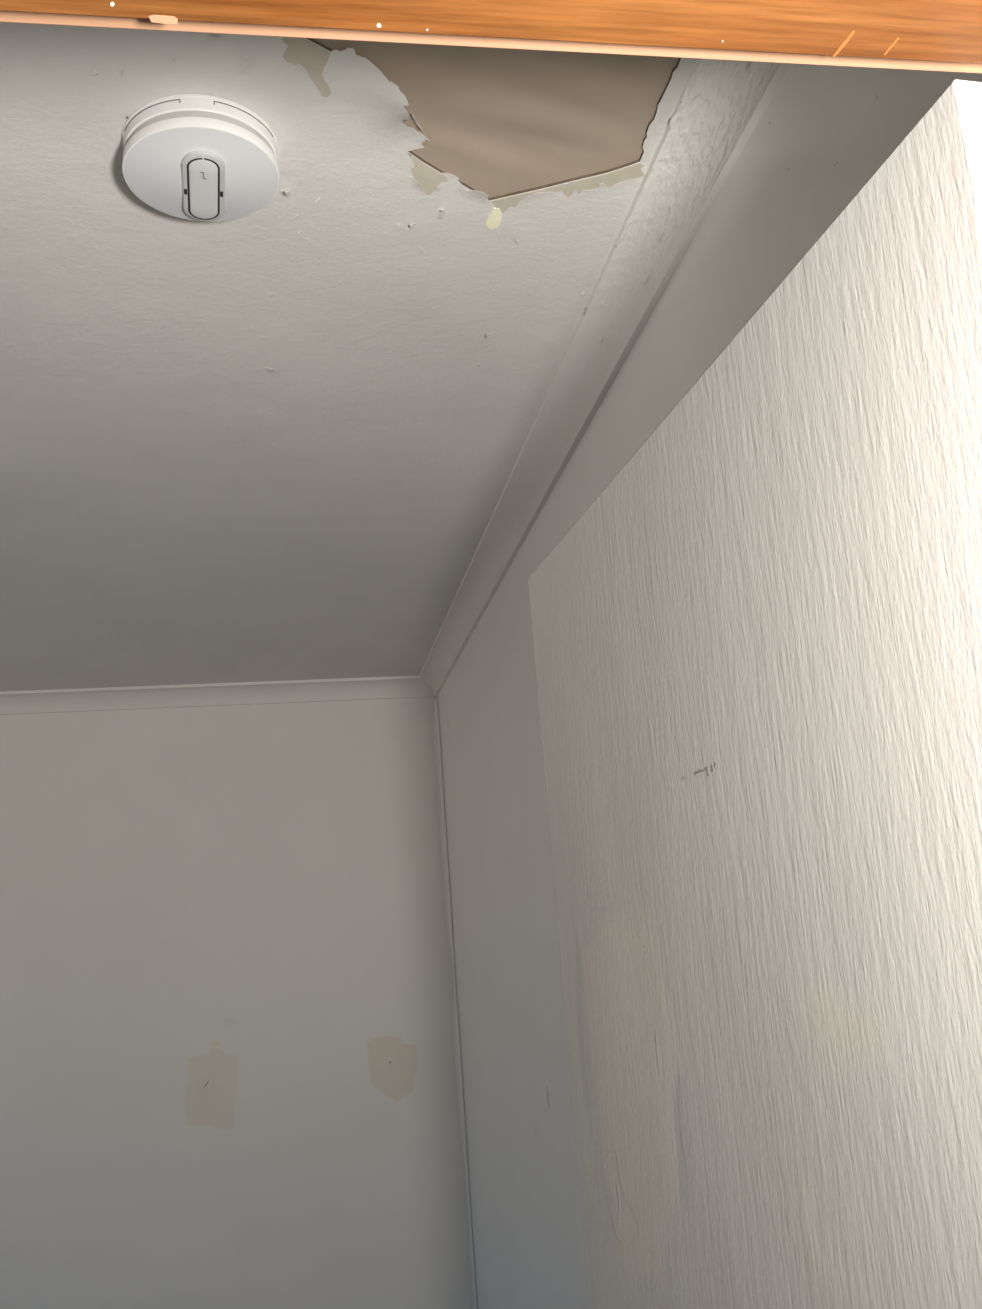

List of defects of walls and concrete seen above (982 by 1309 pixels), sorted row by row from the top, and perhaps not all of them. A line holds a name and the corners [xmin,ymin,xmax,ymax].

peeling [249,35,648,230]